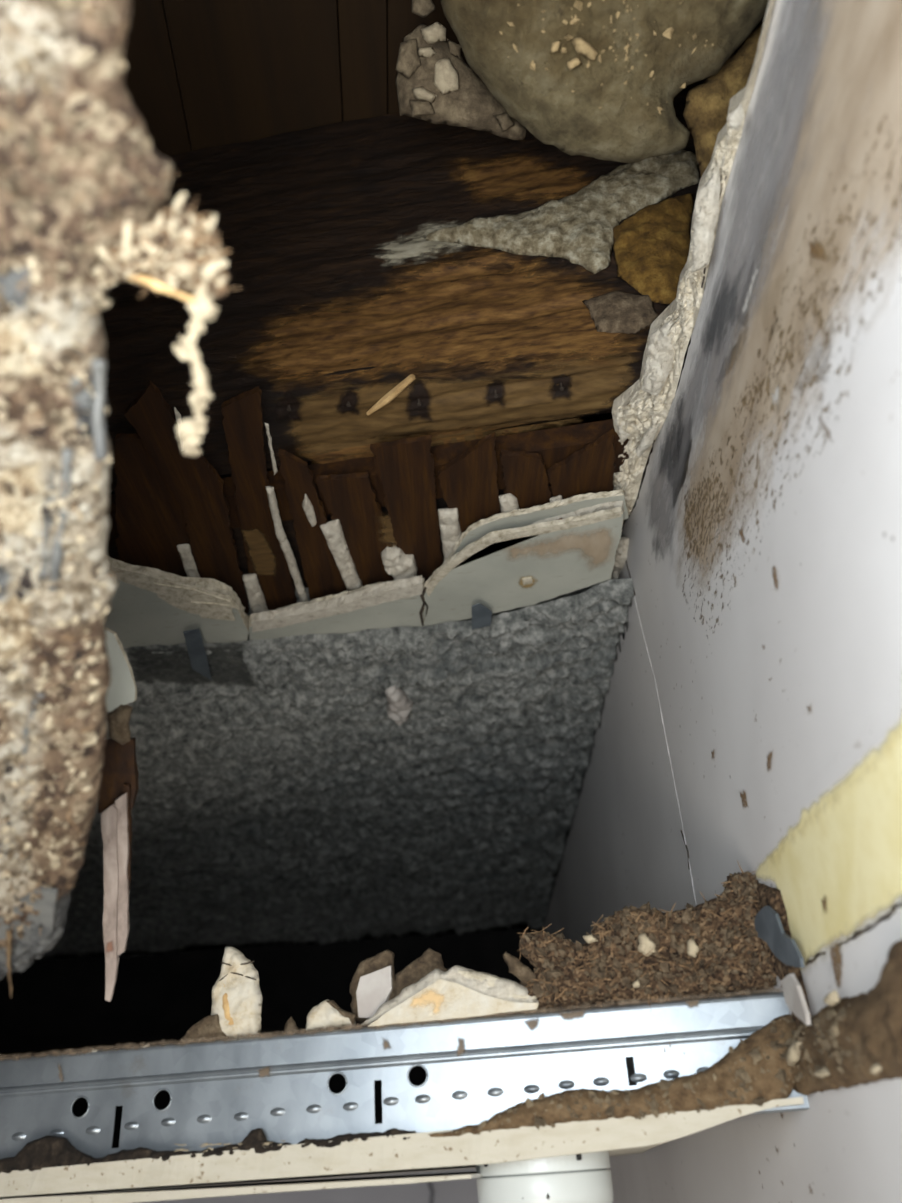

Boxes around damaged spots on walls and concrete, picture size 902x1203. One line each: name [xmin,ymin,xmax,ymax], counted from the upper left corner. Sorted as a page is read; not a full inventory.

leakage [651,0,902,637]
spalling [609,535,629,580]
spalling [131,644,254,687]
peeling [374,675,413,725]